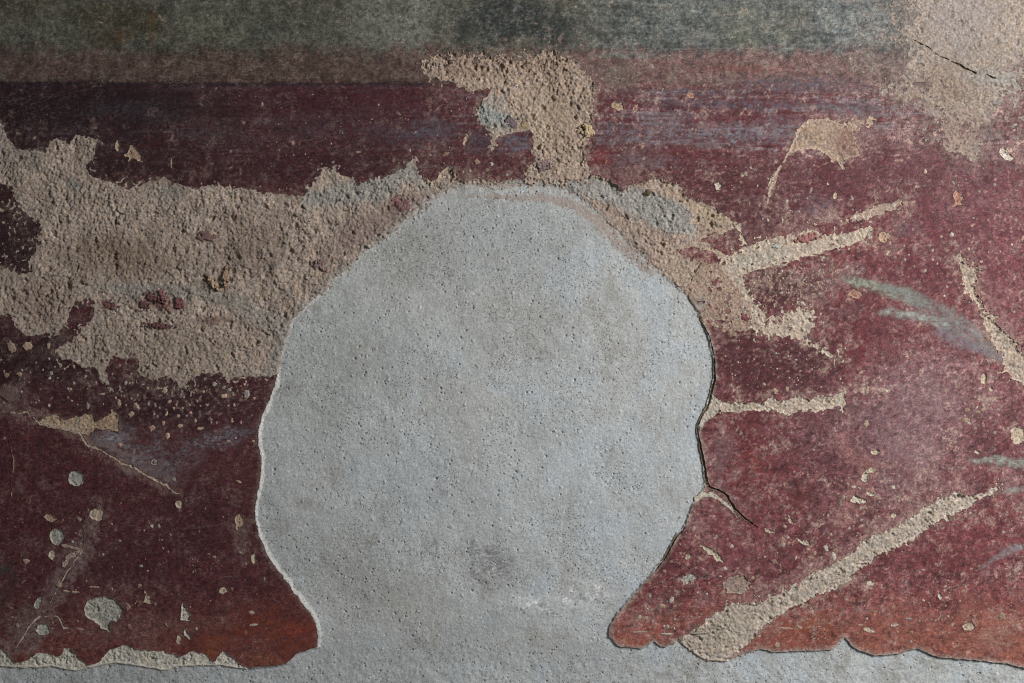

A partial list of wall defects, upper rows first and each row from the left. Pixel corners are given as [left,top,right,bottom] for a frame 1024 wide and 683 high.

crack [909,38,997,79]
flaking render [0,0,1024,427]
crack [694,319,758,527]
flaking render [56,580,157,634]
flaking render [0,602,249,672]
flaking render [633,449,1018,662]